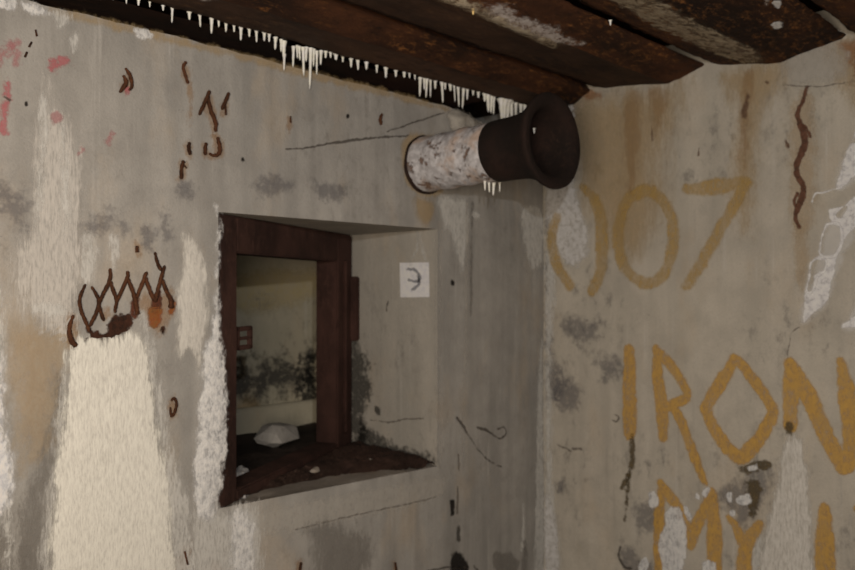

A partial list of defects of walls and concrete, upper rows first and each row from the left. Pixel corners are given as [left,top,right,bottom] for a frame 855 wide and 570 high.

efflorescence [0,0,69,27]
efflorescence [133,28,153,40]
leakage [187,11,527,119]
efflorescence [444,0,584,48]
leakage [0,321,15,566]
leakage [11,77,316,570]
mould [352,341,434,460]
leakage [520,182,589,570]
leakage [451,527,469,570]